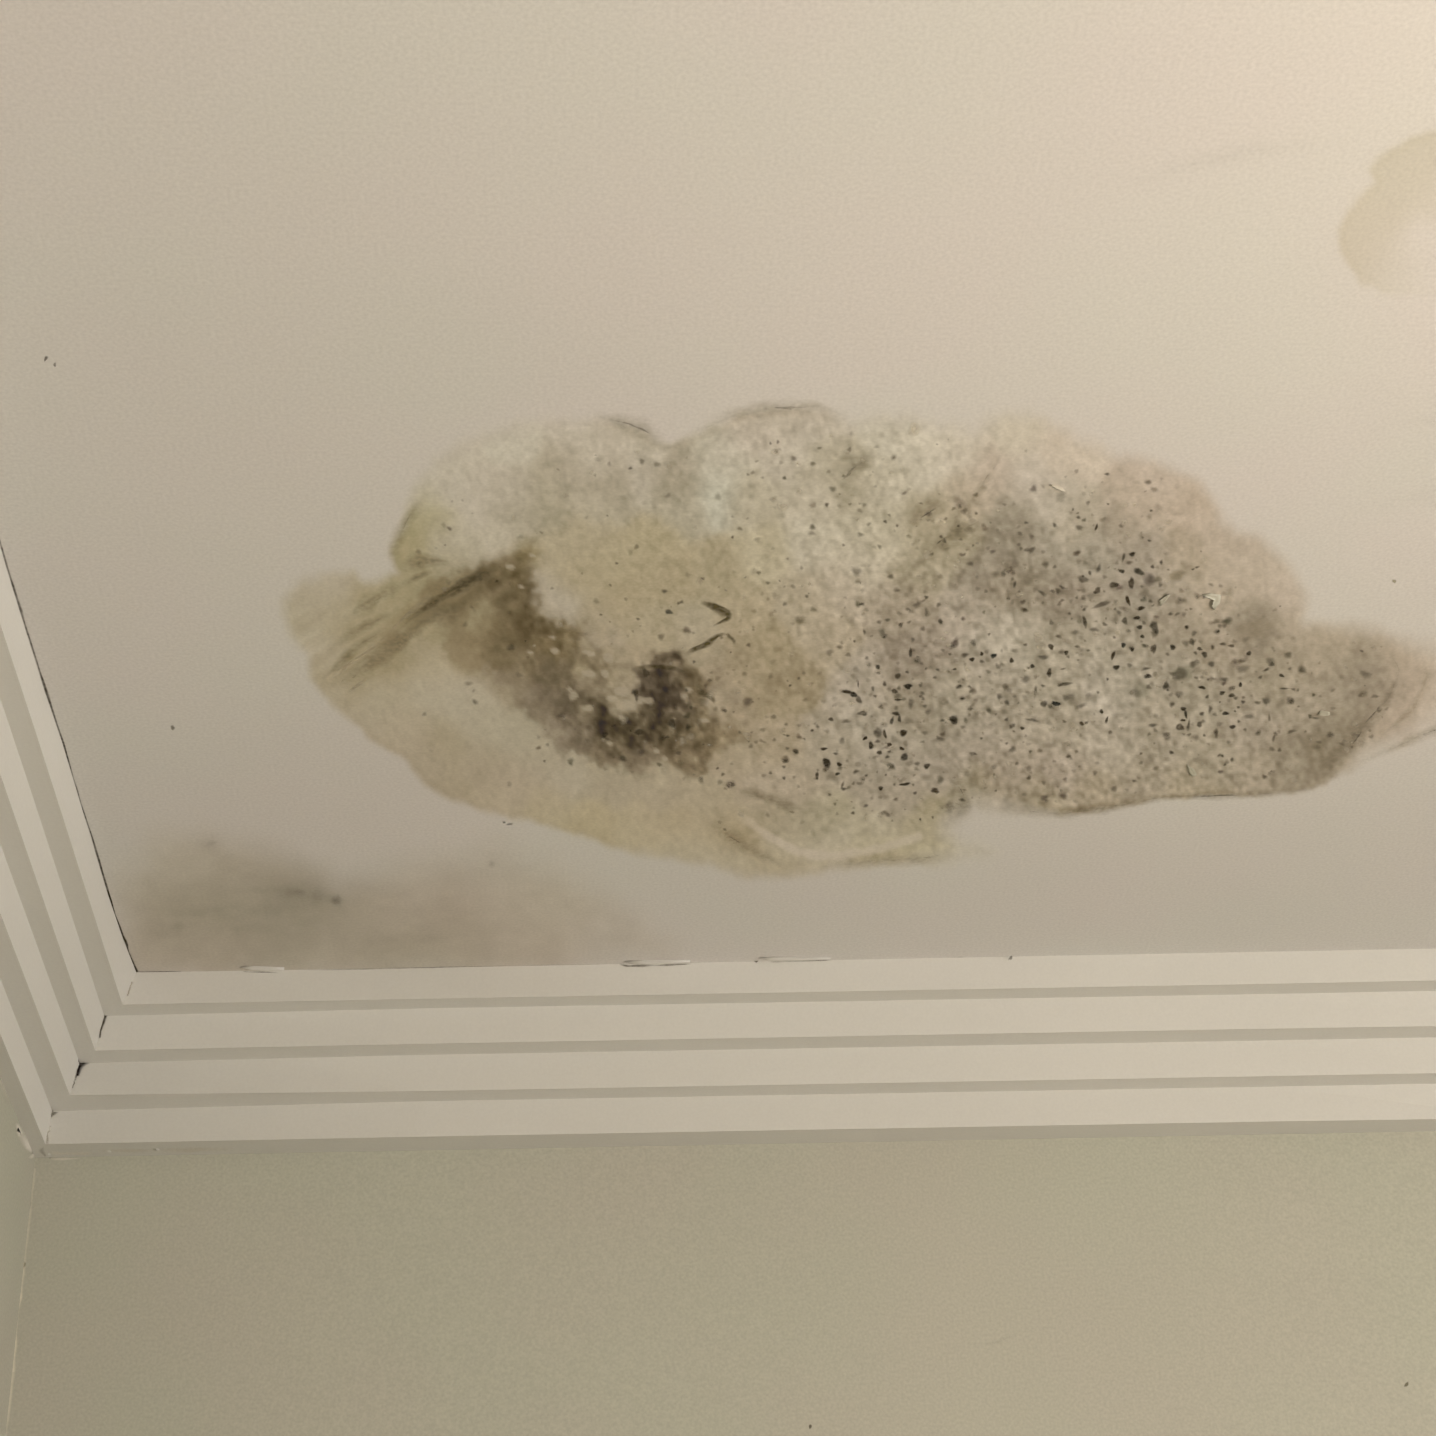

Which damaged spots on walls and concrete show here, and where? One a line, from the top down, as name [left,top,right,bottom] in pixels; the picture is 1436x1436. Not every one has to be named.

water stain [1331,125,1436,303]
water stain [99,397,1436,972]